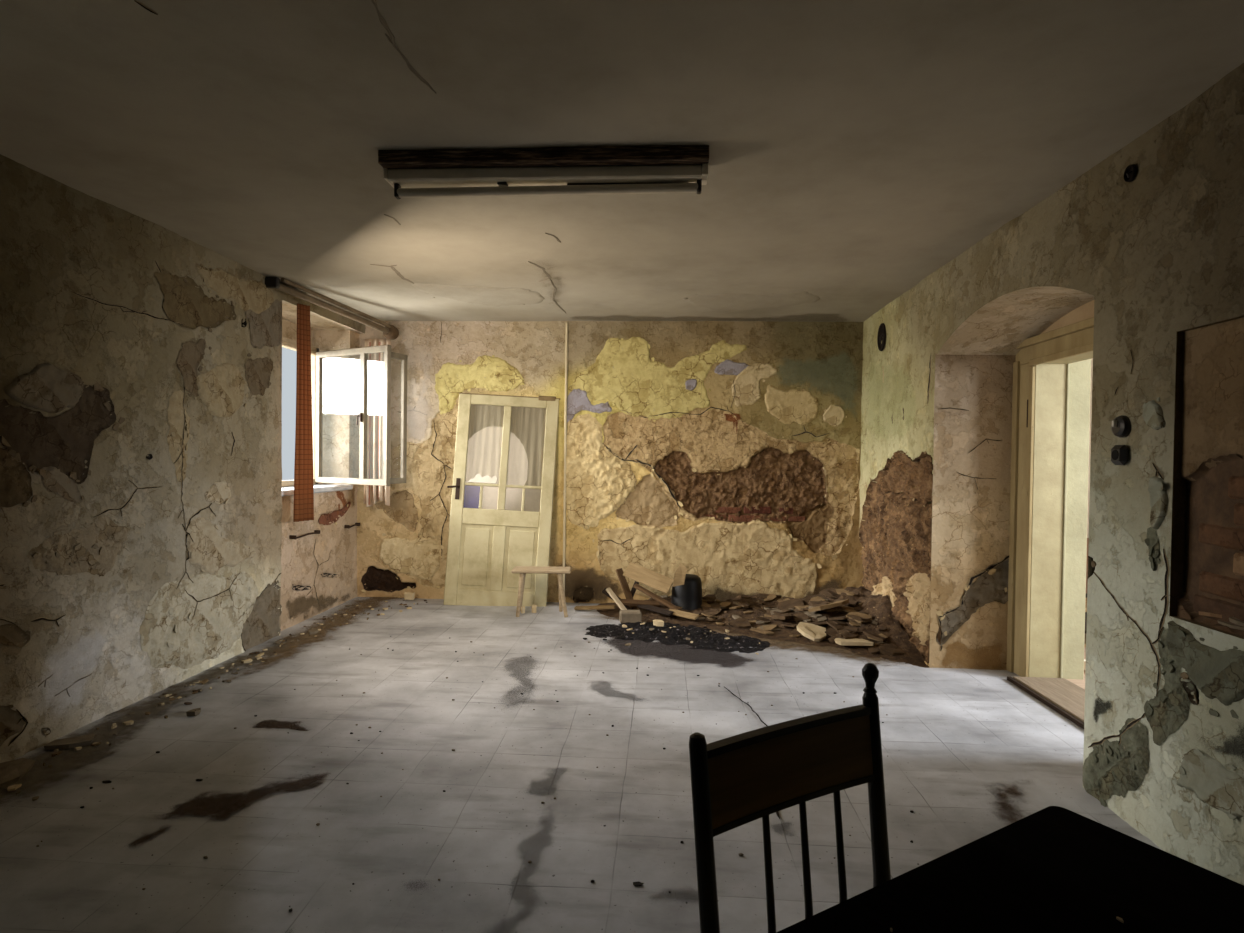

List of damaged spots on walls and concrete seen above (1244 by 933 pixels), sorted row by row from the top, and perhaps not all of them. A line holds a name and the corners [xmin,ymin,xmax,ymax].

crack [371,0,436,94]
crack [0,614,66,627]
spalling [0,382,125,508]
crack [93,384,240,617]
spalling [154,269,281,482]
peeling [139,572,311,669]
crack [306,539,331,606]
spalling [361,355,524,592]
spalling [563,337,1009,663]
crack [1088,549,1169,748]
spalling [1082,454,1244,807]
water stain [485,766,571,933]